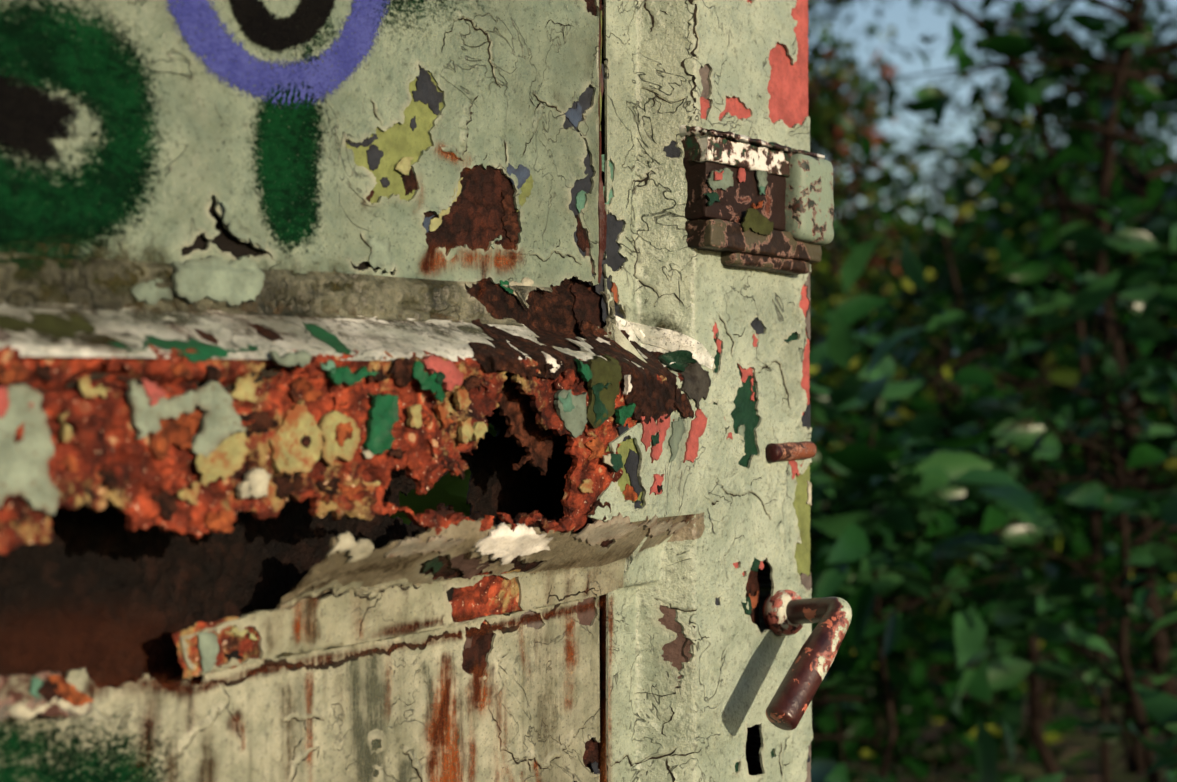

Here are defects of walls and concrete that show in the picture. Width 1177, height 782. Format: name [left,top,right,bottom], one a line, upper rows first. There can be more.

crack [439,10,562,165]
crack [642,0,702,121]
peeling [767,0,809,128]
spalling [0,322,553,691]
corrosion [433,503,565,527]
corrosion [421,145,677,476]
peeling [541,151,721,546]
peeling [724,364,759,467]
corrosion [294,576,358,665]
crack [165,572,601,782]
corrosion [347,550,598,782]
crack [610,595,709,782]